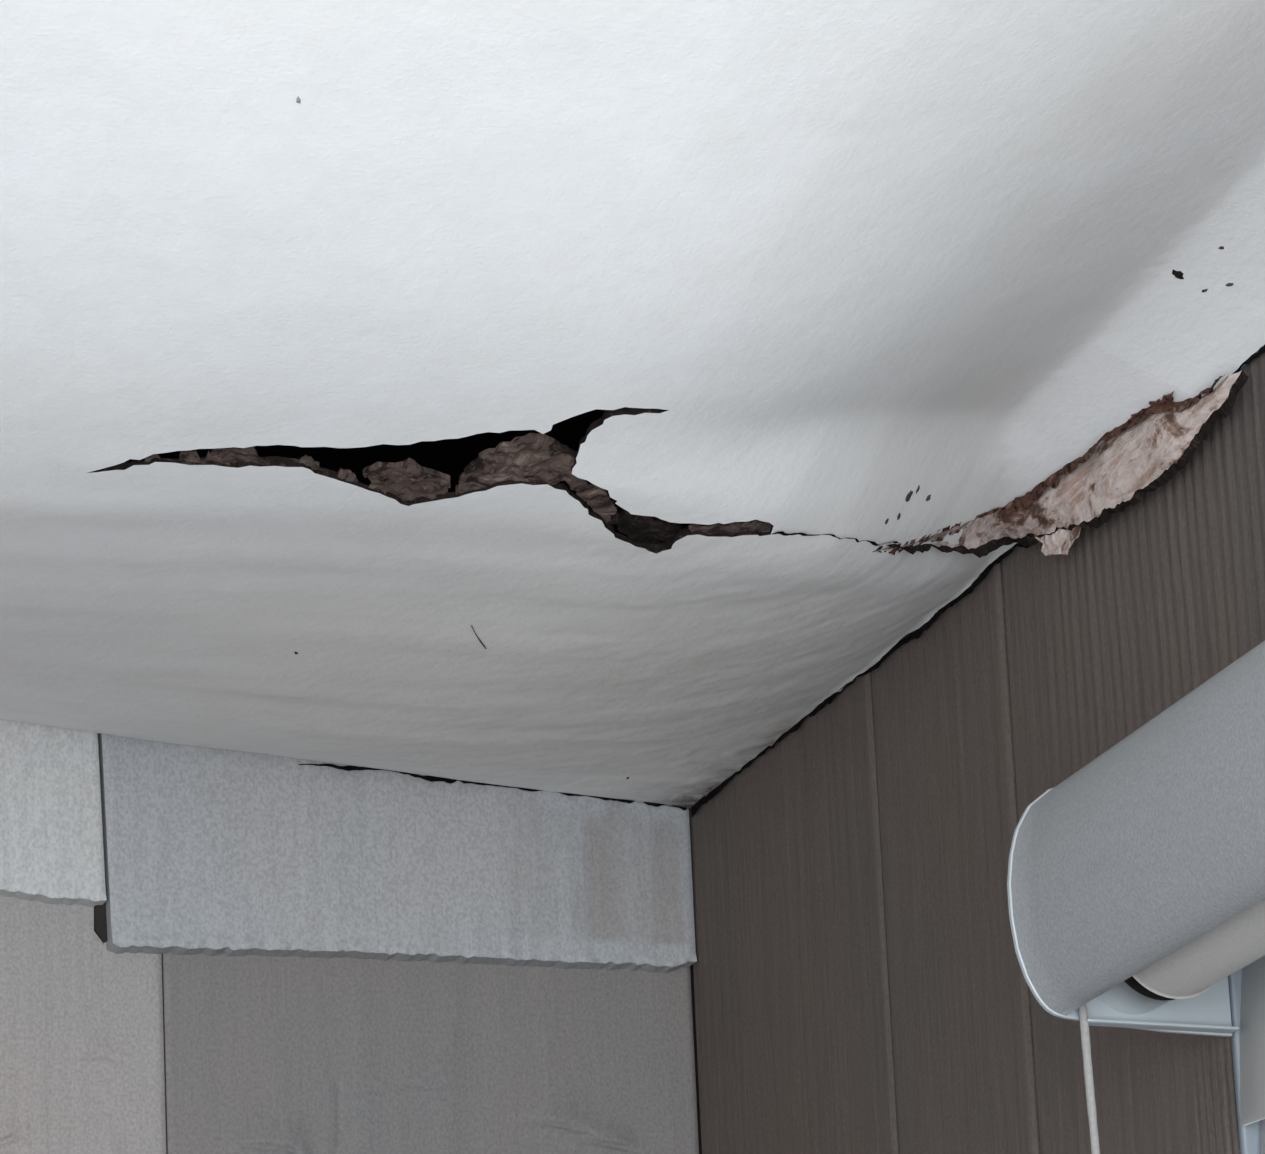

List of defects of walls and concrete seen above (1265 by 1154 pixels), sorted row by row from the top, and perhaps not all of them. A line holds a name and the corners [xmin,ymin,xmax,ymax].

crack [88,407,899,554]
peeling [873,371,1249,558]